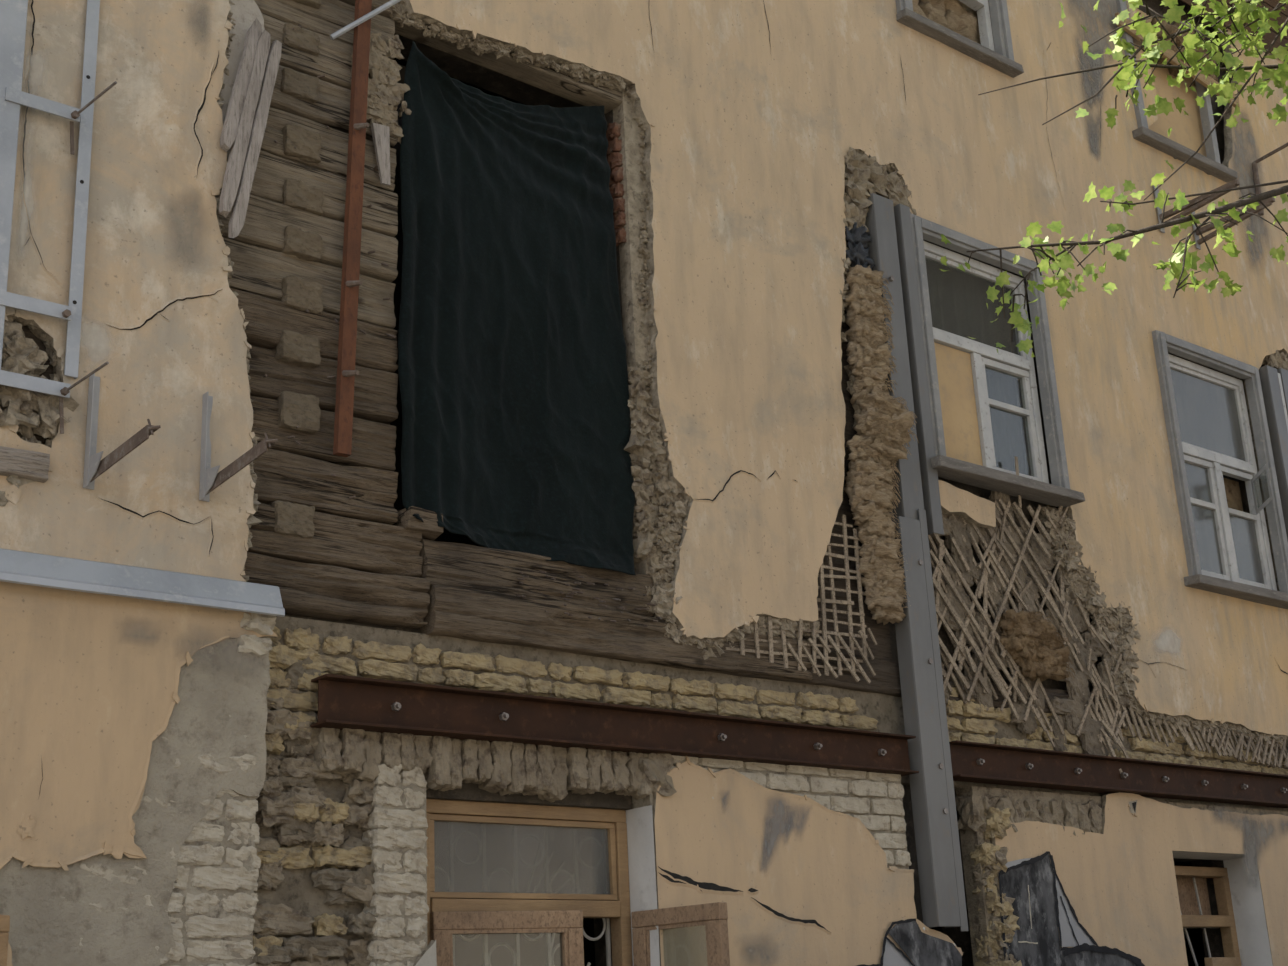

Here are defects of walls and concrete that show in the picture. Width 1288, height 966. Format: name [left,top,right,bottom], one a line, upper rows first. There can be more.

crack [106,288,223,330]
spalling [389,0,820,660]
crack [96,496,214,557]
spalling [240,432,263,581]
crack [694,470,798,503]
spalling [1038,507,1288,748]
peeling [0,635,229,871]
spalling [257,626,372,891]
spalling [631,753,914,873]
spalling [955,795,1102,836]
spalling [253,910,377,966]
crack [657,866,831,935]